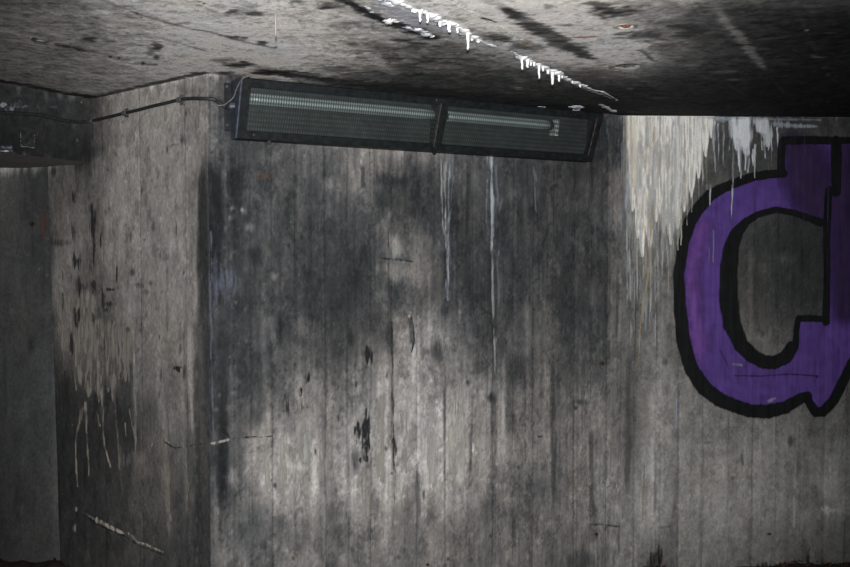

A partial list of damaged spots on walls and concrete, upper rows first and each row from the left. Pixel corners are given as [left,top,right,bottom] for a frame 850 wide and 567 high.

leakage [440,157,453,197]
leakage [486,156,498,250]
crack [149,428,272,450]
crack [73,507,163,555]